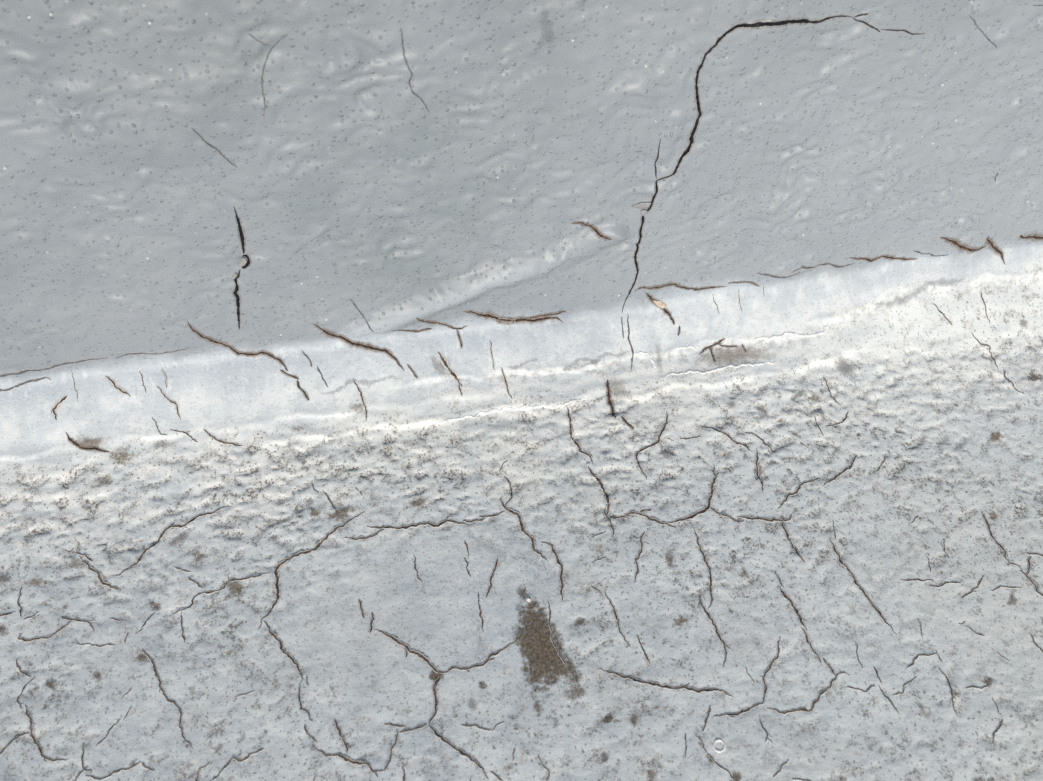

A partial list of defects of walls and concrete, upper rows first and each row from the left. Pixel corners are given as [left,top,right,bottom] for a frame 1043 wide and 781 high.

crack [571,13,1043,370]
crack [0,206,328,453]
crack [353,379,368,421]
crack [314,300,565,399]
crack [933,291,1025,395]
crack [0,461,579,781]
crack [567,378,1003,781]
crack [900,511,1043,662]